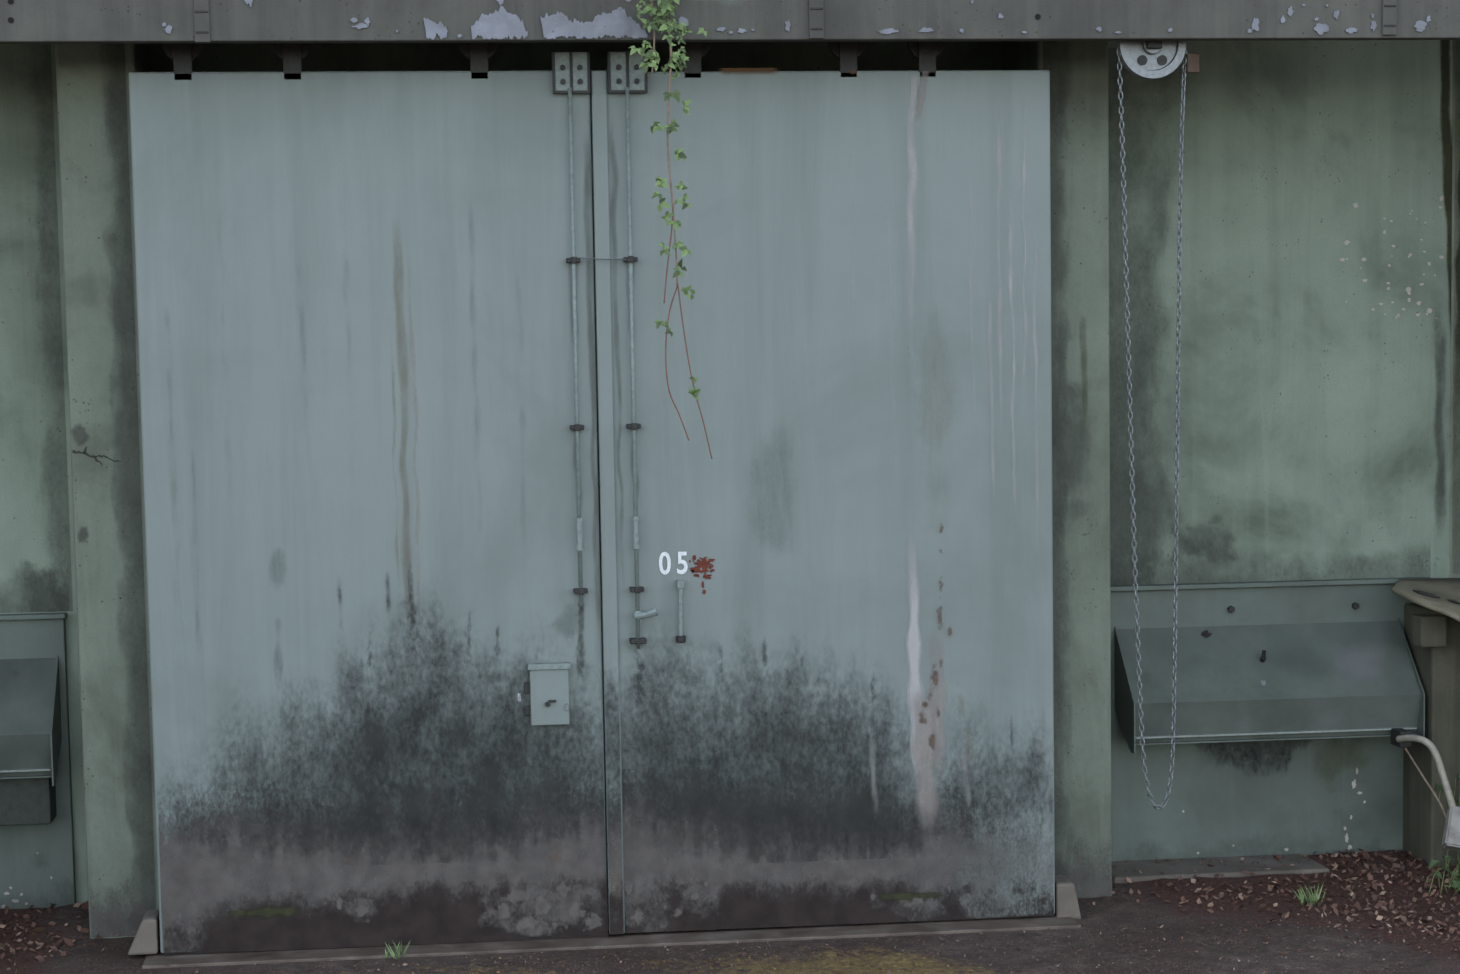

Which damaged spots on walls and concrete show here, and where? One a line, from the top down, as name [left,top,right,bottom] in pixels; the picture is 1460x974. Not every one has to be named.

peeling [350,17,370,29]
peeling [424,0,651,40]
peeling [1280,4,1377,35]
peeling [1414,15,1431,32]
water stain [1043,41,1064,291]
water stain [1109,282,1163,586]
crack [72,446,122,466]
rust [689,555,715,594]
water stain [241,337,1112,934]
rust [920,662,942,749]